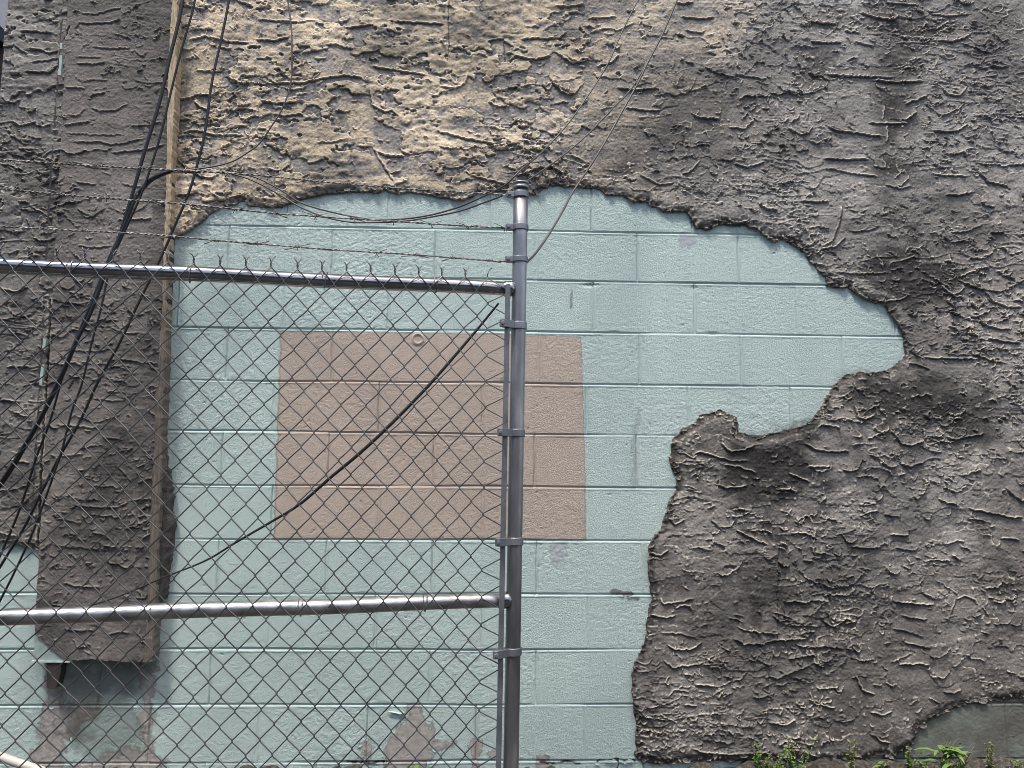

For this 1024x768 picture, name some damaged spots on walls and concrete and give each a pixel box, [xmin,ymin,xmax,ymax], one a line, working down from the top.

spalling [174,187,513,236]
spalling [529,178,885,301]
spalling [610,371,1024,766]
peeling [355,703,496,768]